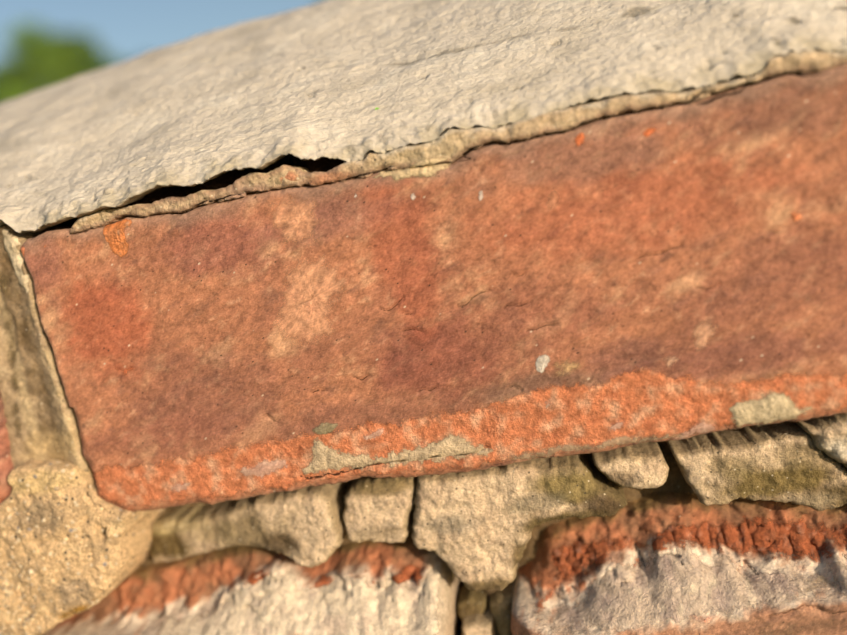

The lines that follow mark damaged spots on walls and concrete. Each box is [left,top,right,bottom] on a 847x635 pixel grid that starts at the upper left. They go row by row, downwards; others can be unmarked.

crack [463,72,828,161]
crack [129,154,399,215]
spalling [245,569,267,585]
spalling [315,574,333,588]
spalling [392,564,423,584]
spalling [551,536,632,581]
spalling [652,516,847,562]